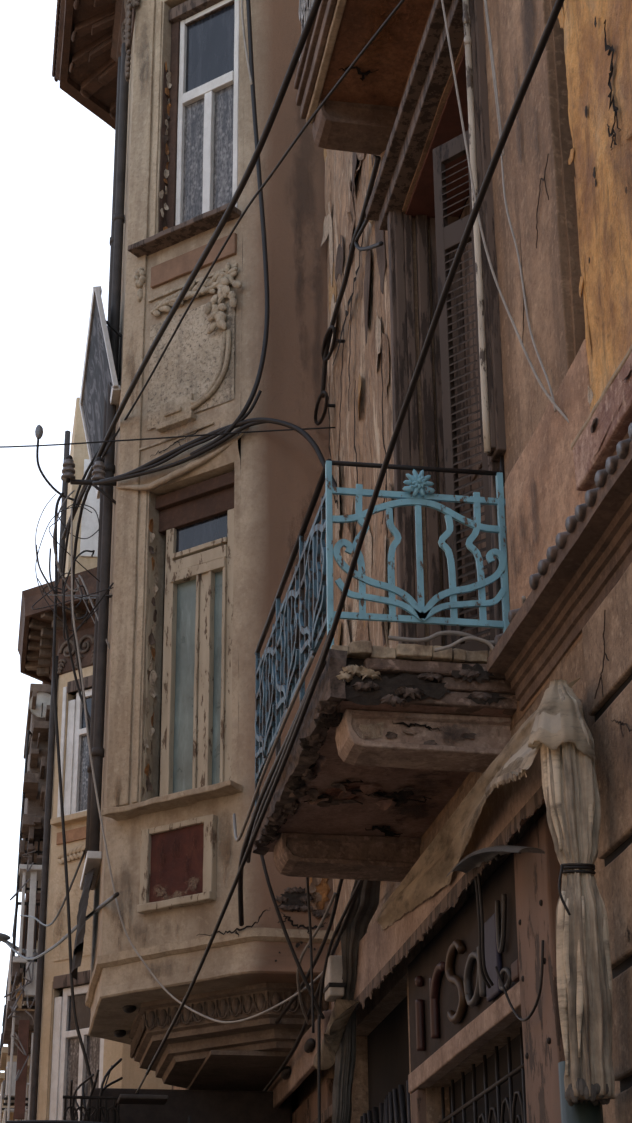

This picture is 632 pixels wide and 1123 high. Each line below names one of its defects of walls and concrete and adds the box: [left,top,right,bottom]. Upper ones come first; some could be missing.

peeling [159,62,172,232]
crack [604,19,621,150]
flaking render [251,149,508,856]
peeling [142,518,159,801]
crack [594,610,632,738]
crack [198,910,328,937]